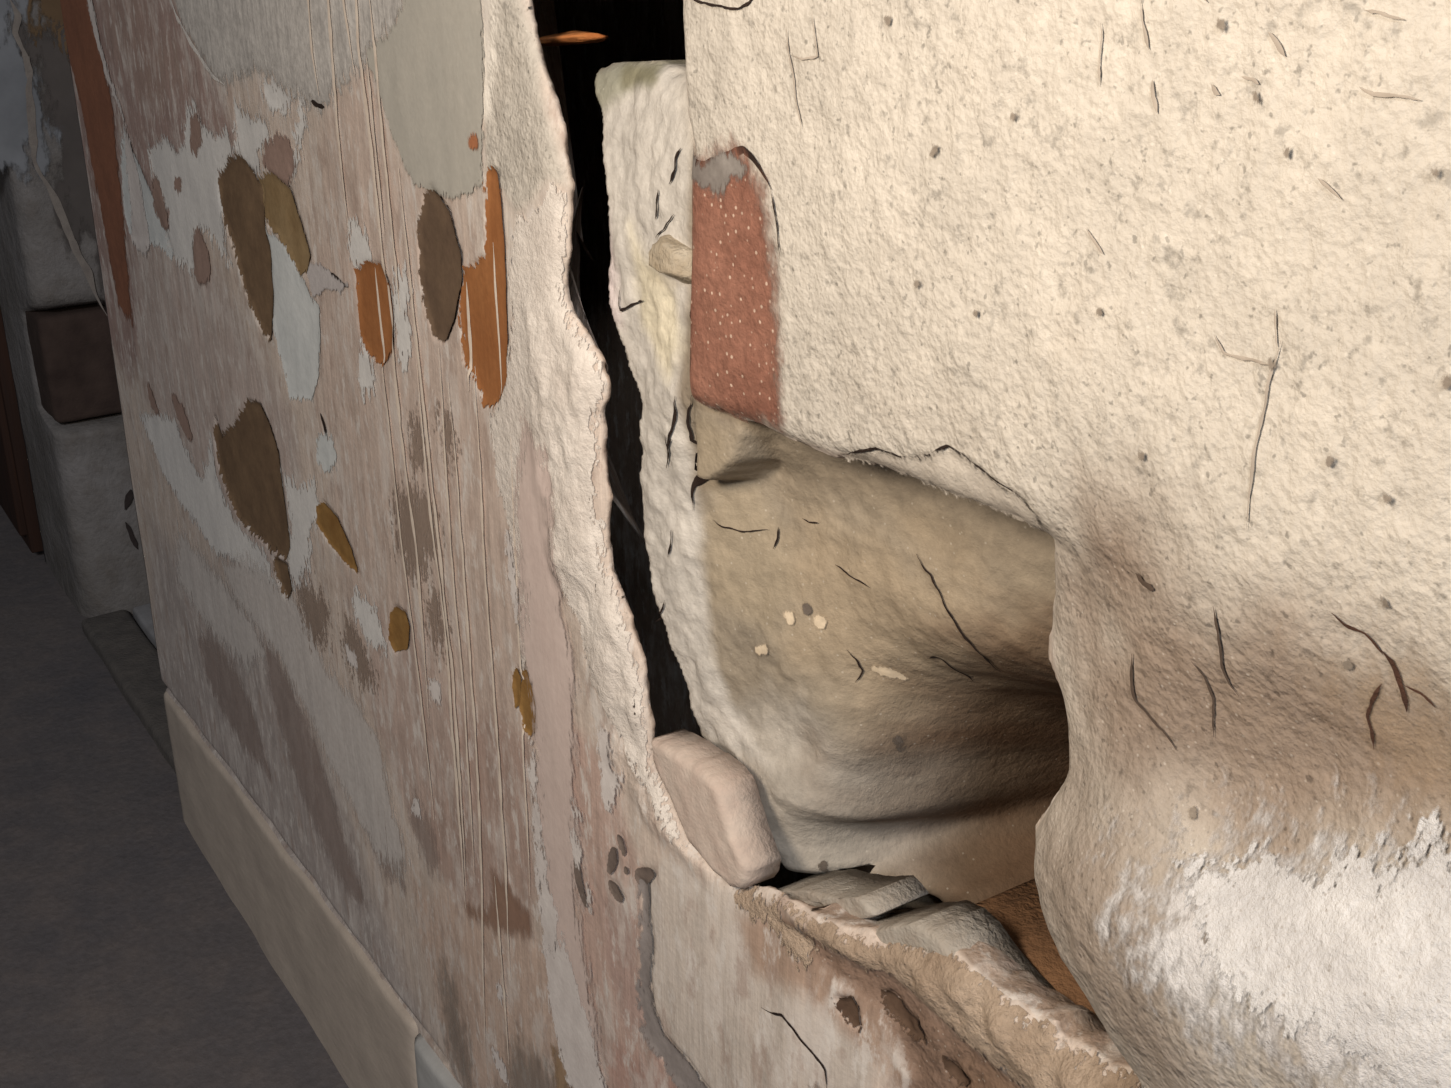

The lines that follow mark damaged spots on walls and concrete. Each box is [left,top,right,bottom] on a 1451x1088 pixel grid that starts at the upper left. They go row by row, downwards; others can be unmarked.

flaking render [176,0,403,344]
spalling [539,31,609,46]
crack [694,0,751,10]
crack [1359,87,1421,101]
flaking render [346,165,508,408]
flaking render [213,397,461,694]
flaking render [512,668,536,737]
spalling [595,60,1141,1088]
crack [842,445,1028,507]
crack [1214,309,1281,529]
crack [1332,613,1436,750]
water stain [1095,801,1451,1088]